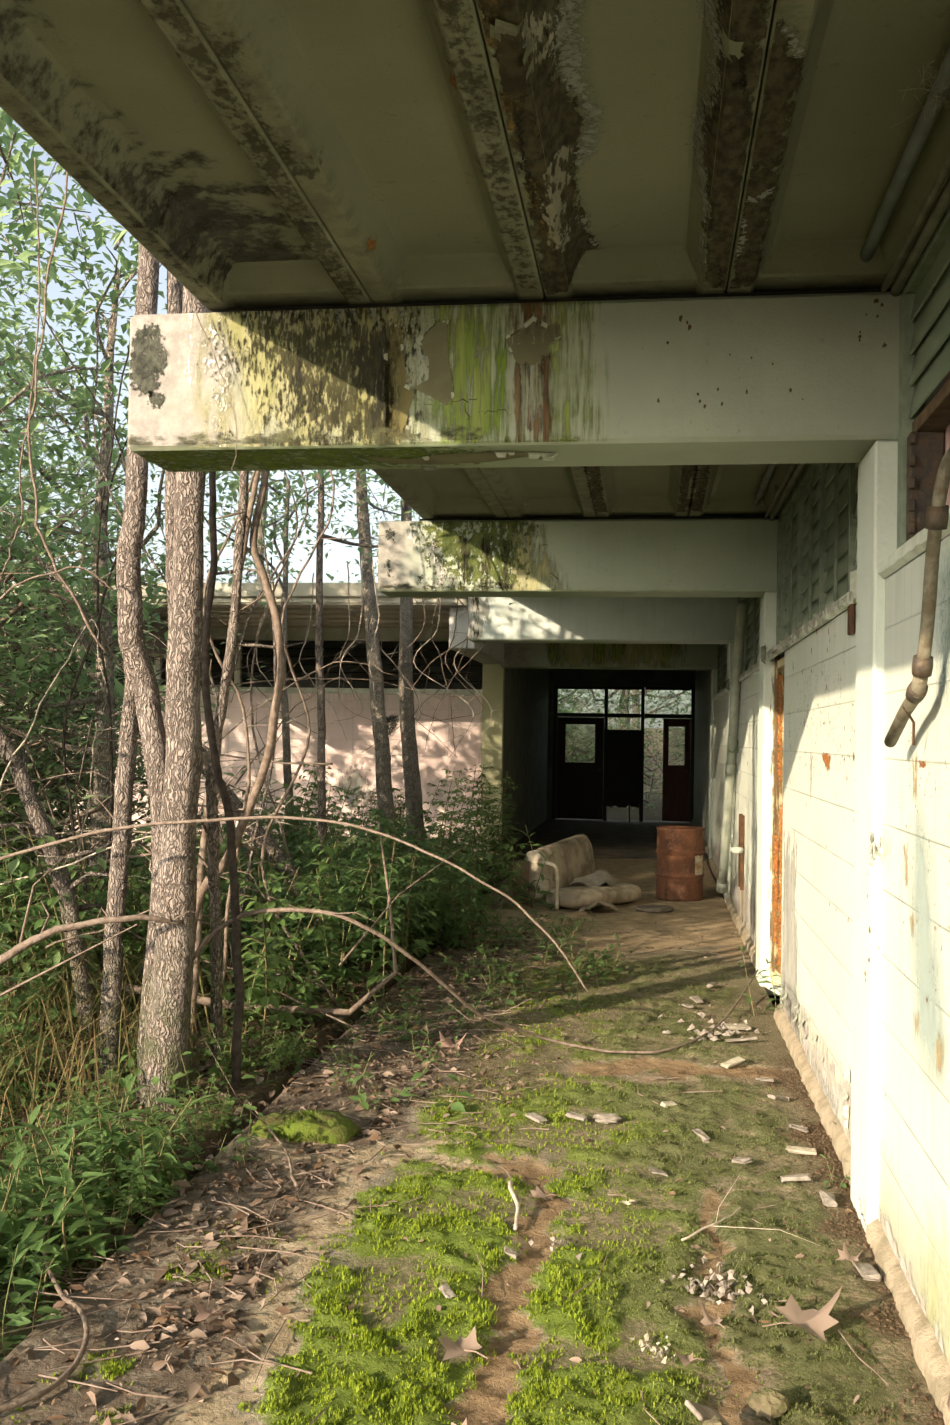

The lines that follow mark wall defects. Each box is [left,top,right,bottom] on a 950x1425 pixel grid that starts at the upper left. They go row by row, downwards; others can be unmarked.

mould [0,0,58,123]
spalling [490,19,535,100]
spalling [718,26,750,91]
water stain [54,0,481,446]
peeling [384,320,454,437]
corrosion [508,302,556,331]
corrosion [514,354,551,442]
peeling [505,316,561,365]
corrosion [768,655,784,974]